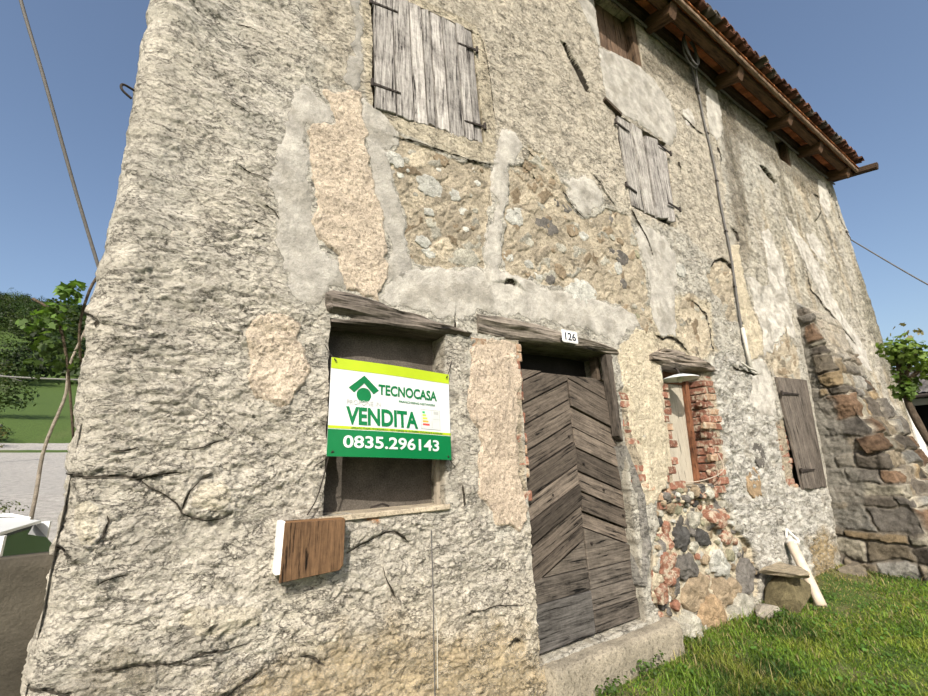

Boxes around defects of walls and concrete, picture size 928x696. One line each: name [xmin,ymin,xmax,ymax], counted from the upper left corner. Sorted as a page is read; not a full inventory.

spalling [386,135,492,269]
spalling [501,146,774,639]
crack [181,440,223,450]
crack [65,470,231,522]
crack [223,673,258,696]